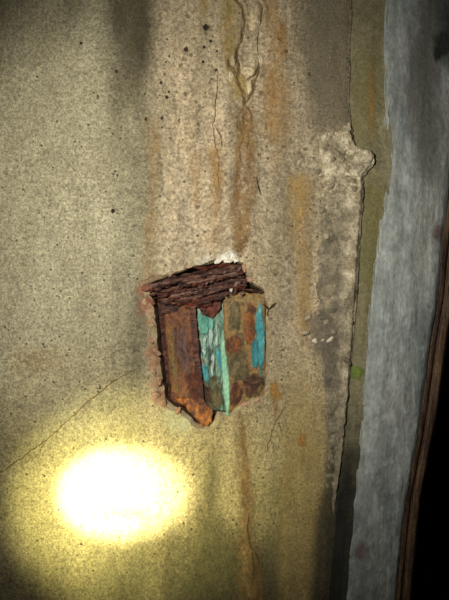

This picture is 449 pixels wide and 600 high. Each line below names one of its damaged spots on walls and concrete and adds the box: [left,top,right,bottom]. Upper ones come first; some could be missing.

crack [212,0,263,199]
rust [233,107,254,253]
crack [1,360,148,472]
spalling [137,257,270,431]
rust [149,262,281,427]